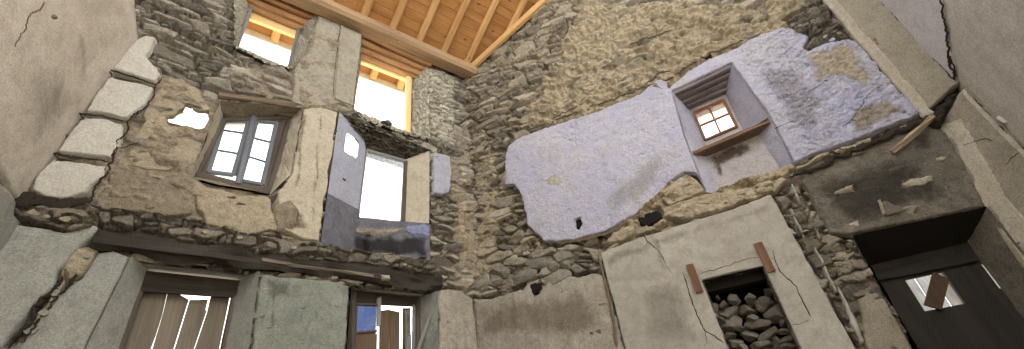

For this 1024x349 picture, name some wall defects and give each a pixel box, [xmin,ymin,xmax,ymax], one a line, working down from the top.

crack [15,2,45,47]
flaking render [788,0,867,83]
crack [789,0,1024,178]
crack [7,273,78,349]
flaking render [473,225,636,298]
crack [559,214,811,347]
flaking render [662,102,912,349]